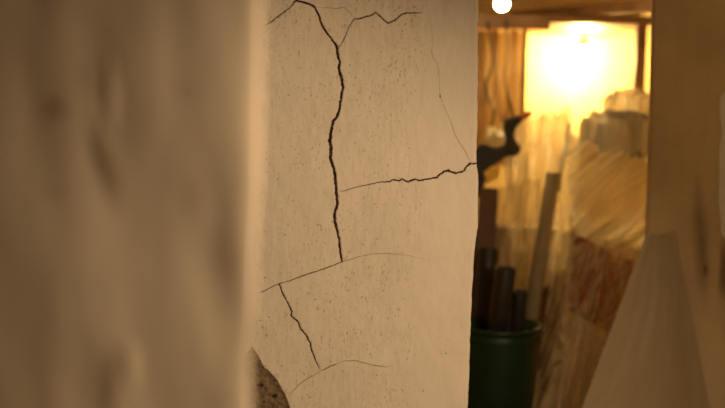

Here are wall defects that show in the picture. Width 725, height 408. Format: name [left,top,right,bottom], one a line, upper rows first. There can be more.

spalling [251,346,290,408]
crack [260,0,477,390]